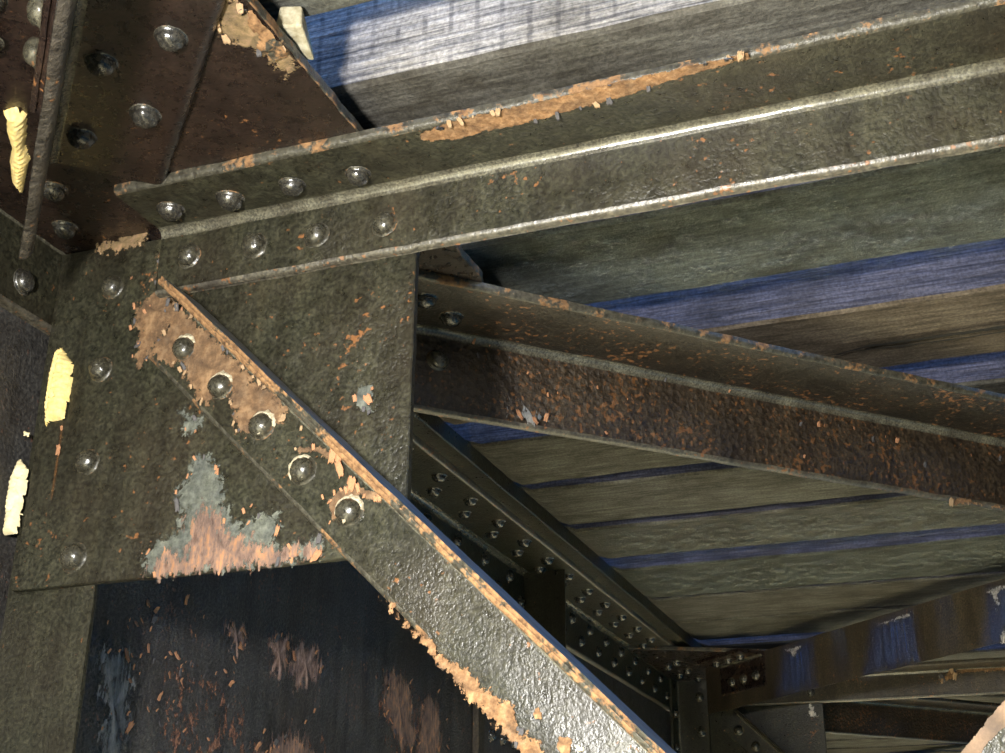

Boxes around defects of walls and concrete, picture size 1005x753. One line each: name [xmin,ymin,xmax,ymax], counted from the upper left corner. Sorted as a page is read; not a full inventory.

peeling [129,253,288,439]
peeling [140,452,329,584]
peeling [287,443,382,524]
corrosion [949,497,1004,511]
peeling [89,618,249,753]
corrosion [249,725,314,753]
peeling [267,631,331,695]
corrosion [381,665,450,753]
peeling [378,595,544,753]
peeling [557,736,573,753]
peeling [961,700,1005,753]